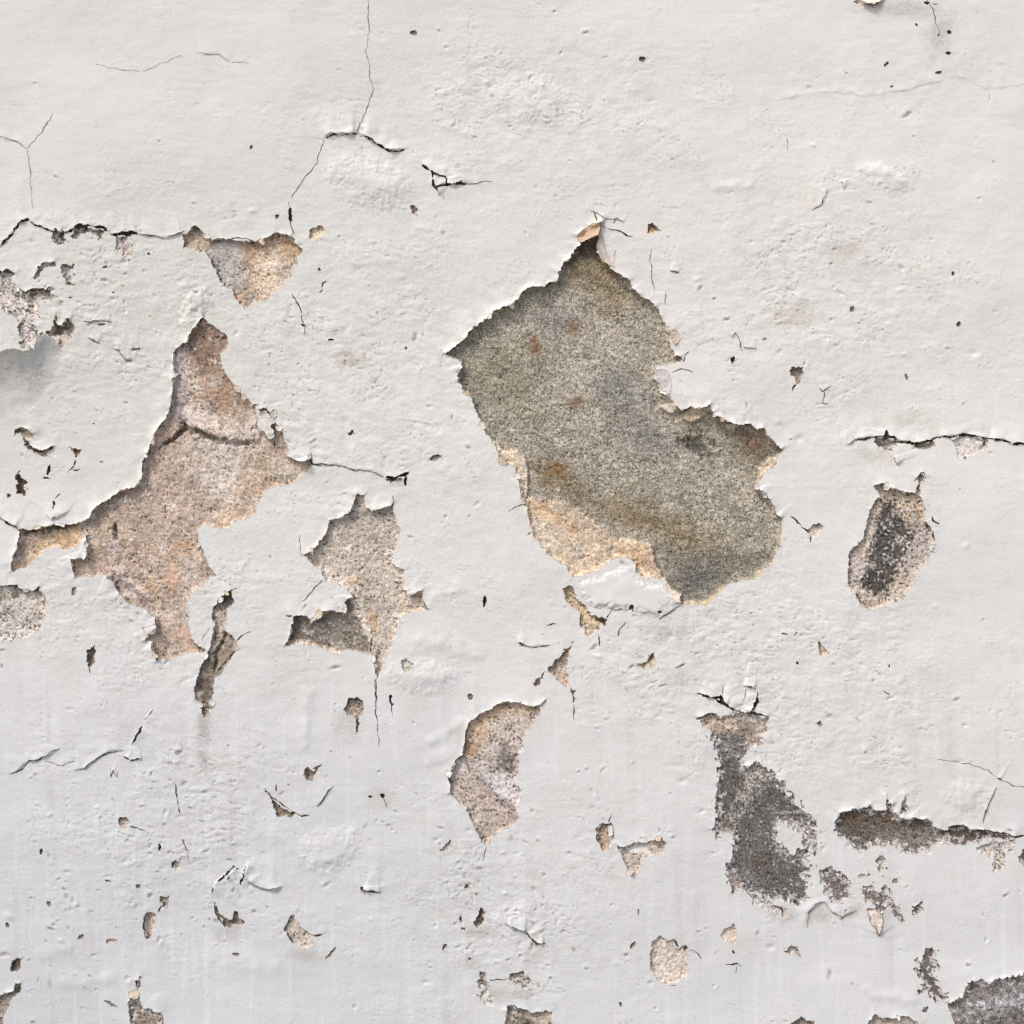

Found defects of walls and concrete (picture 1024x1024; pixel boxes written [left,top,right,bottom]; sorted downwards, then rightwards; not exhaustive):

crack [288,4,490,233]
peeling [0,262,75,419]
peeling [182,225,326,309]
peeling [0,585,48,643]
peeling [7,316,321,718]
peeling [284,477,428,733]
spalling [445,210,823,646]
peeling [848,472,937,610]
crack [849,430,1024,463]
peeling [445,701,546,860]
spalling [696,706,1024,936]
spalling [868,947,1024,1024]